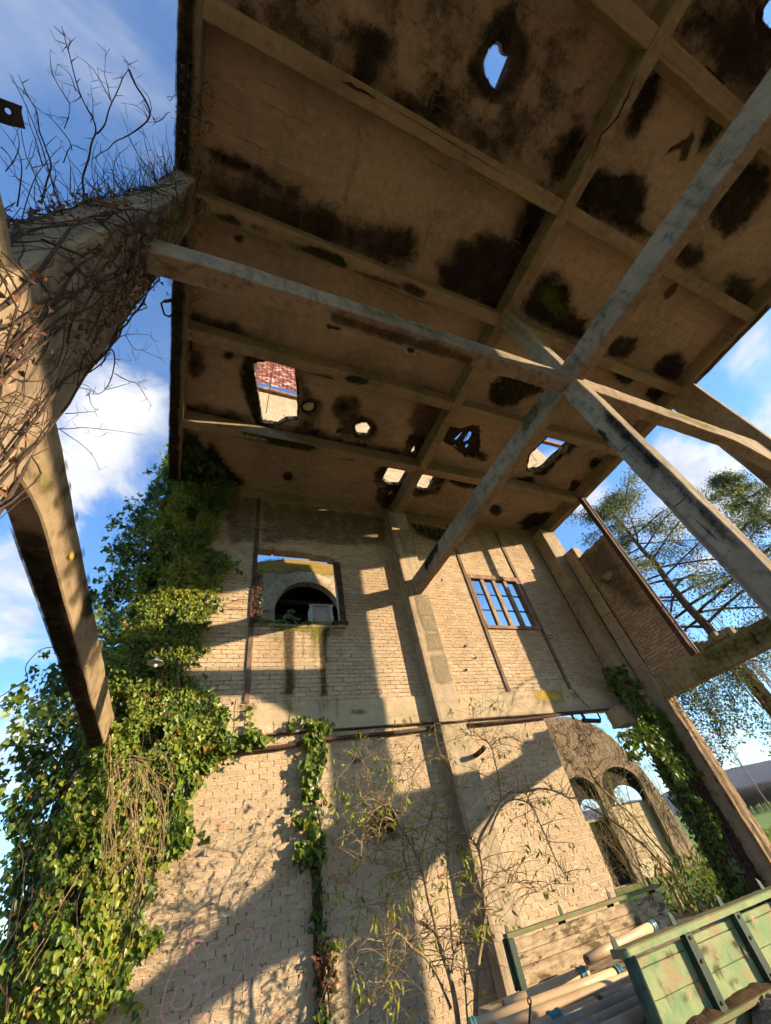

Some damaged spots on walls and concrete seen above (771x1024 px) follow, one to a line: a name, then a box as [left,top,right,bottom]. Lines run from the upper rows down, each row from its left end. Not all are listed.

leakage [391,30,589,160]
spalling [467,3,528,155]
leakage [625,71,661,138]
leakage [209,149,417,268]
leakage [575,168,651,236]
leakage [709,160,770,240]
leakage [436,202,545,309]
spalling [240,356,320,431]
spalling [352,416,378,441]
spalling [373,466,408,496]
spalling [412,476,446,497]
spalling [526,437,577,476]